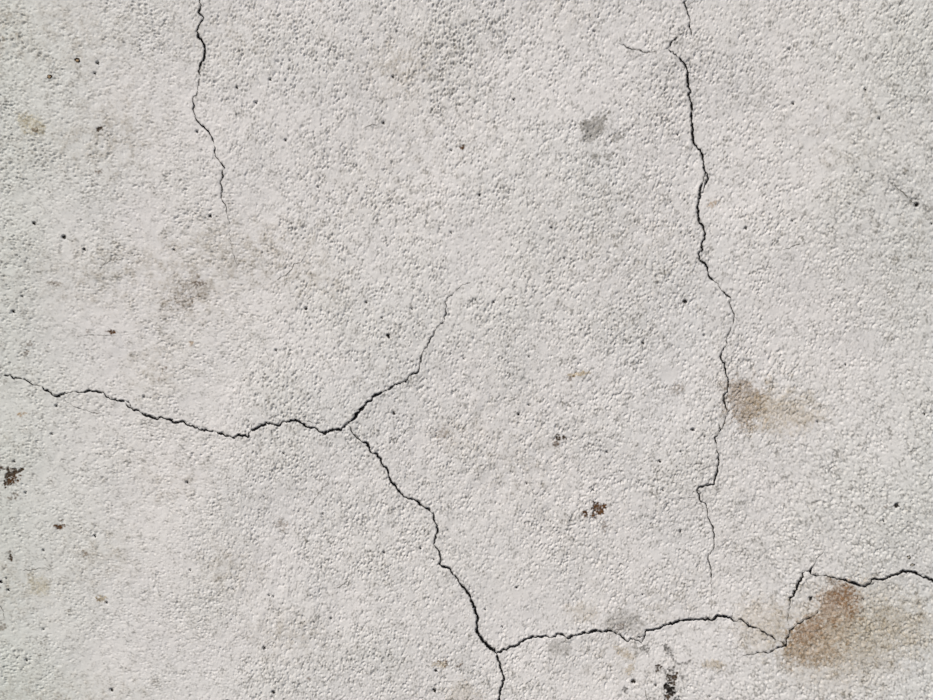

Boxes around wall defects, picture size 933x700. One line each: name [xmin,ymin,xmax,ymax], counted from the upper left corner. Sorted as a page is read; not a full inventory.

crack [192,0,237,264]
crack [0,283,933,700]
crack [668,0,736,594]